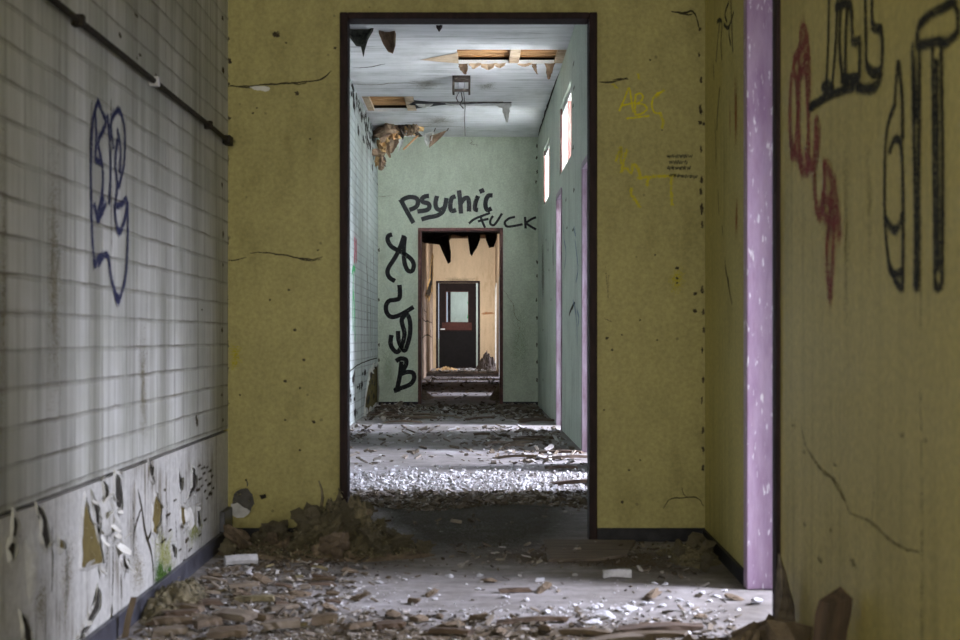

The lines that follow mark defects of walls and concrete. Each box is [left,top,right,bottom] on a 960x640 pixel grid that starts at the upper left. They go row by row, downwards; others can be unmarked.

peeling [379,30,396,54]
crack [228,71,331,92]
peeling [424,128,449,148]
crack [228,252,322,261]
peeling [5,507,21,567]
peeling [34,500,66,555]
peeling [75,469,124,640]
peeling [119,553,131,574]
peeling [147,458,214,562]
flaking render [229,479,268,518]
crack [801,427,919,553]
peeling [18,609,33,640]